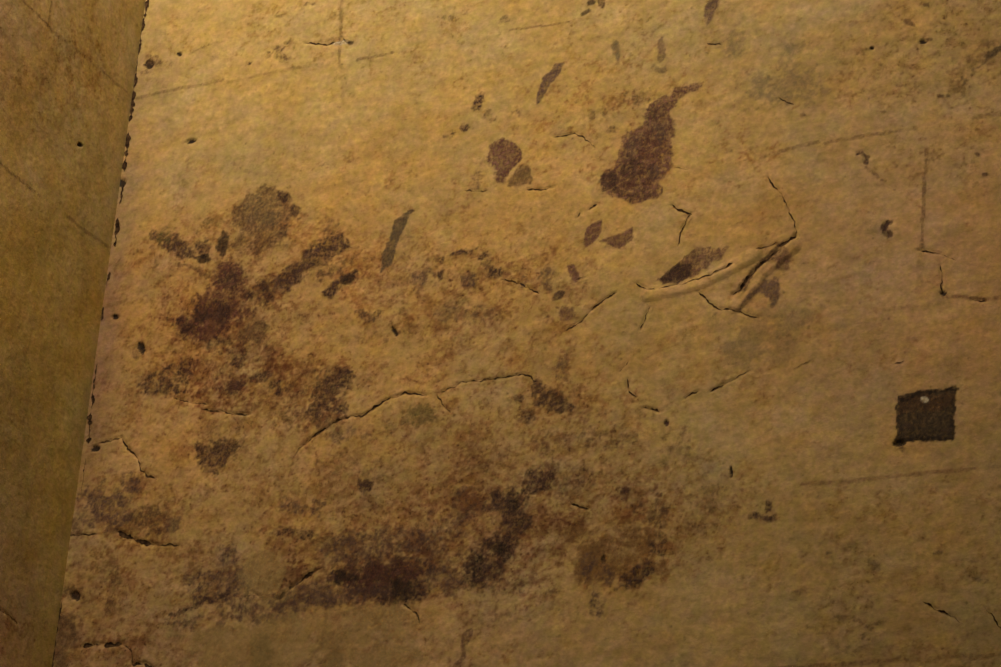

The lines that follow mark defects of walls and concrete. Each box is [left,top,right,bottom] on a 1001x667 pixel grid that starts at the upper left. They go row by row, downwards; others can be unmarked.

leakage [150,187,300,263]
leakage [244,224,358,304]
leakage [381,210,413,272]
leakage [412,249,503,285]
leakage [584,220,633,248]
crack [567,177,797,330]
leakage [657,247,724,284]
leakage [294,367,355,428]
crack [293,374,534,457]
leakage [516,379,574,423]
leakage [195,439,240,474]
leakage [169,470,553,628]